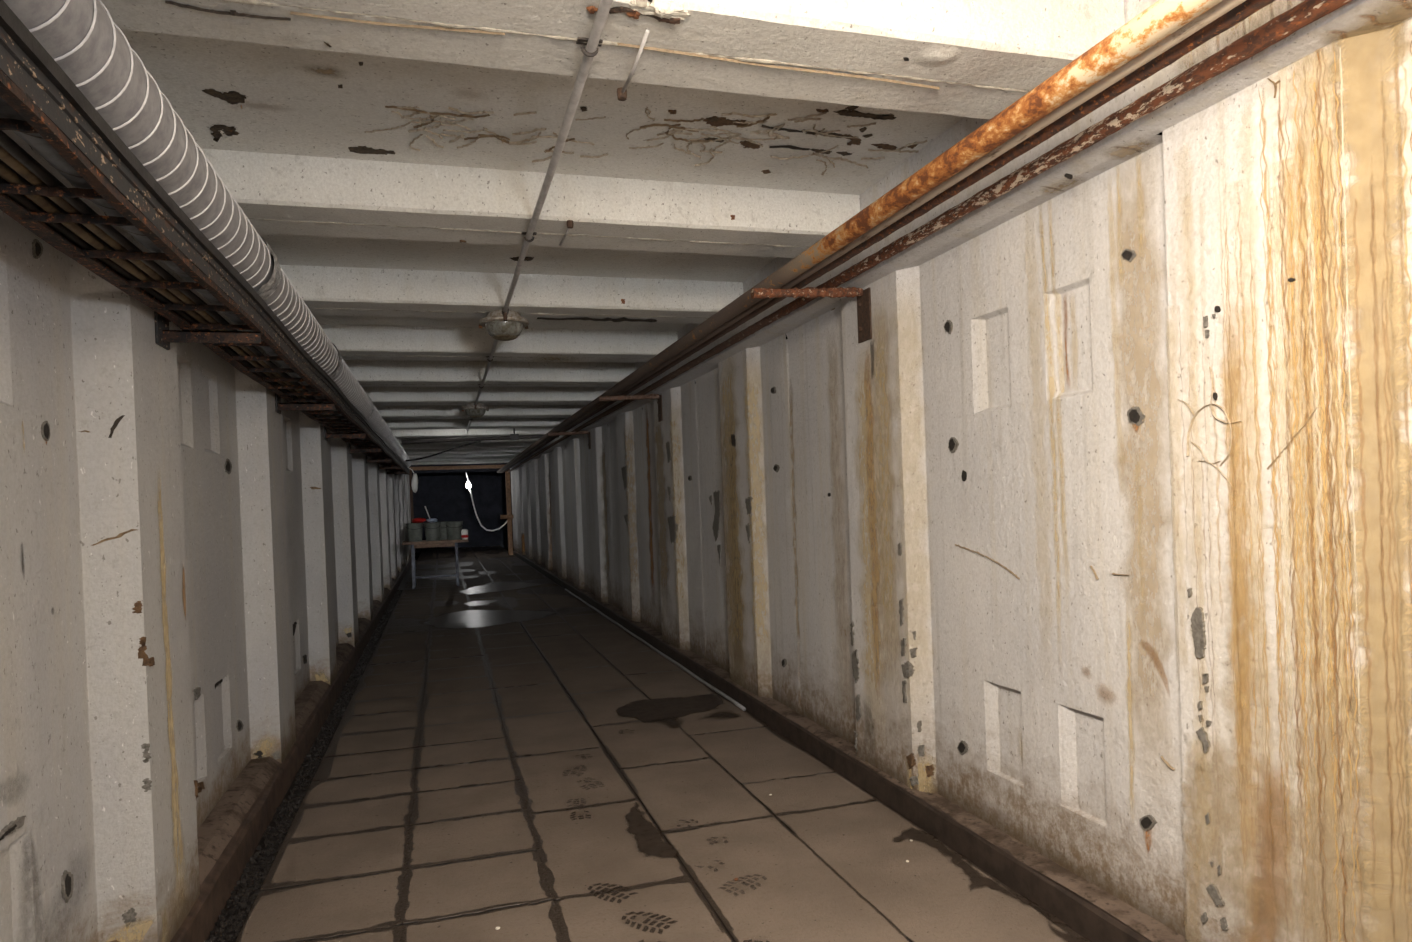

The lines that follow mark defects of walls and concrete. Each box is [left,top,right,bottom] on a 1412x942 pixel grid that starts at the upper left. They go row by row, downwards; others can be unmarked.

spalling [586,0,690,25]
peeling [202,89,246,109]
peeling [210,124,239,142]
crack [364,106,927,175]
corrosion [1045,302,1068,407]
water stain [1229,0,1412,942]
peeling [138,637,155,667]
peeling [1187,588,1212,753]
peeling [141,743,152,792]